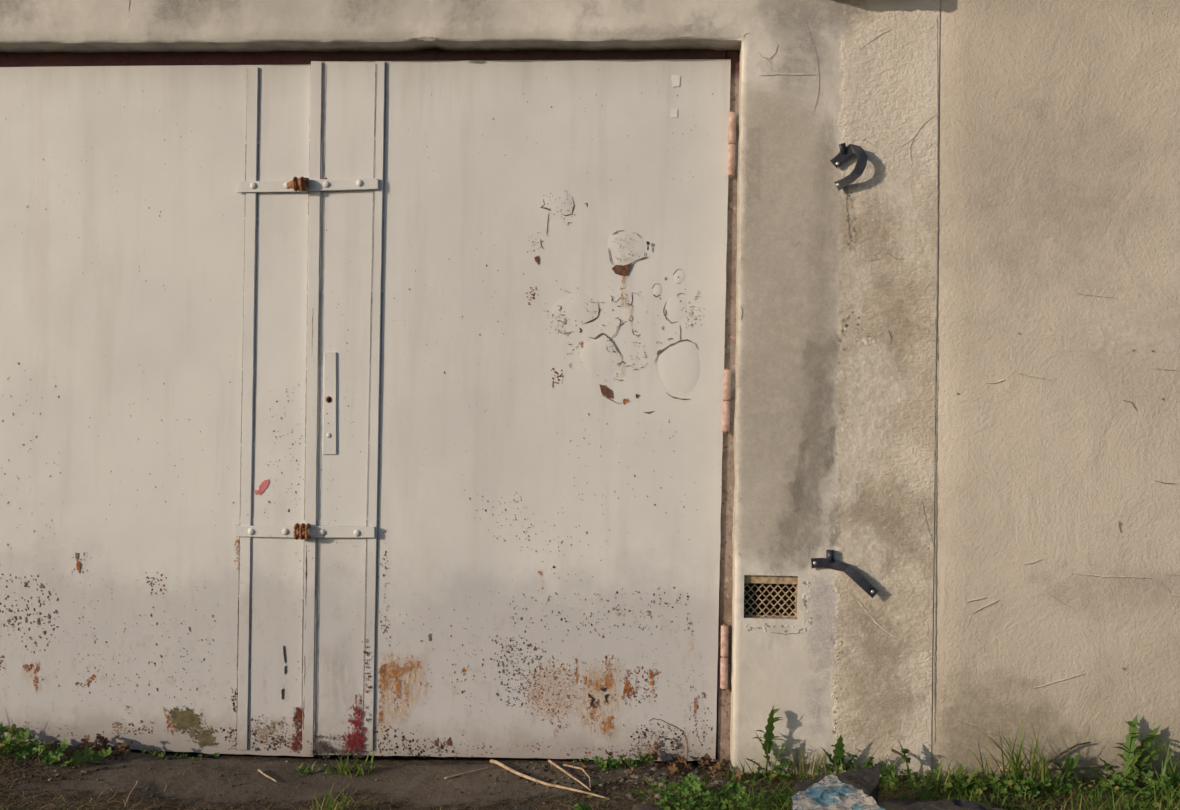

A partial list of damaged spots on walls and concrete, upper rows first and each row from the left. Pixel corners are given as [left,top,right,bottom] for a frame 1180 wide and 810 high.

peeling [526,286,676,405]
damp [737,98,841,557]
rust [341,695,367,755]
rust [377,654,428,723]
rust [526,655,661,737]